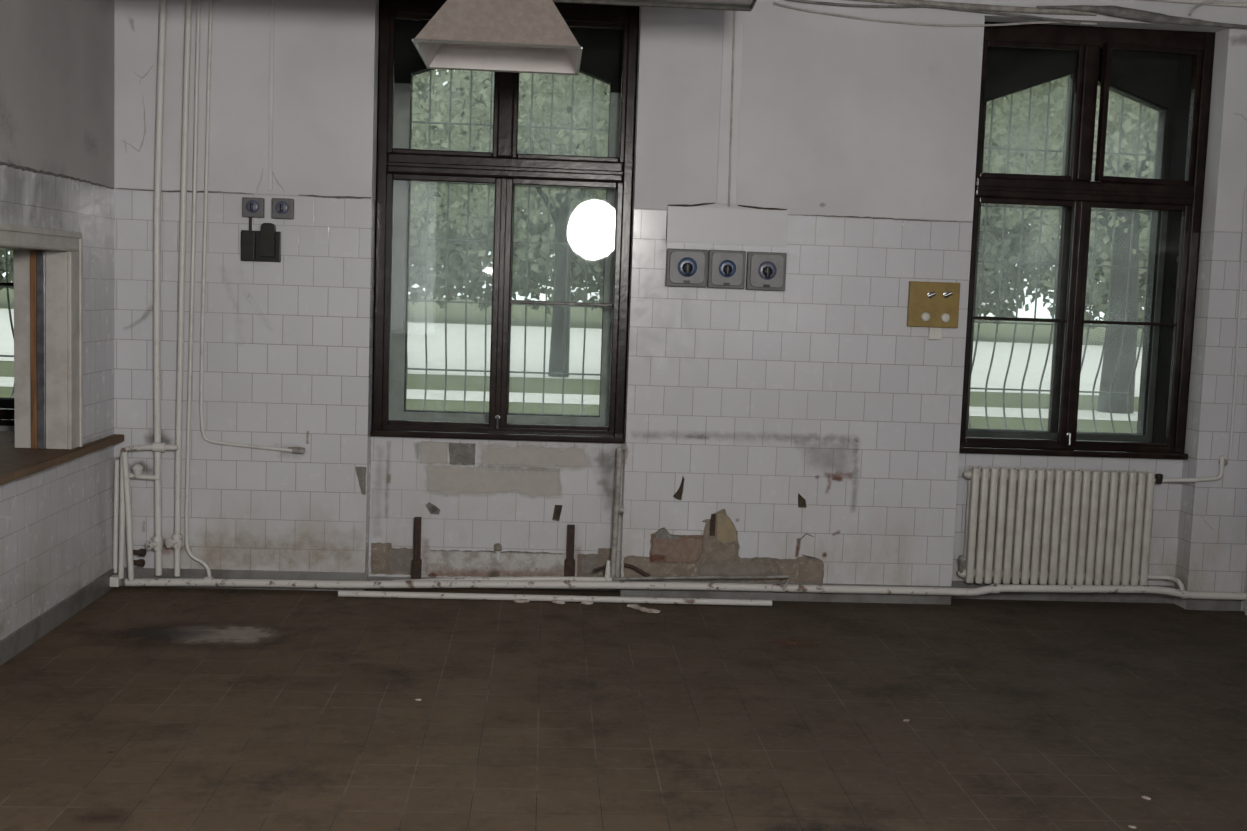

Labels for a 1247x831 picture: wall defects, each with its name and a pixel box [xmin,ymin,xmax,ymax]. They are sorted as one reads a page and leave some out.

peeling [449,442,476,466]
spalling [425,502,440,514]
spalling [623,509,824,583]